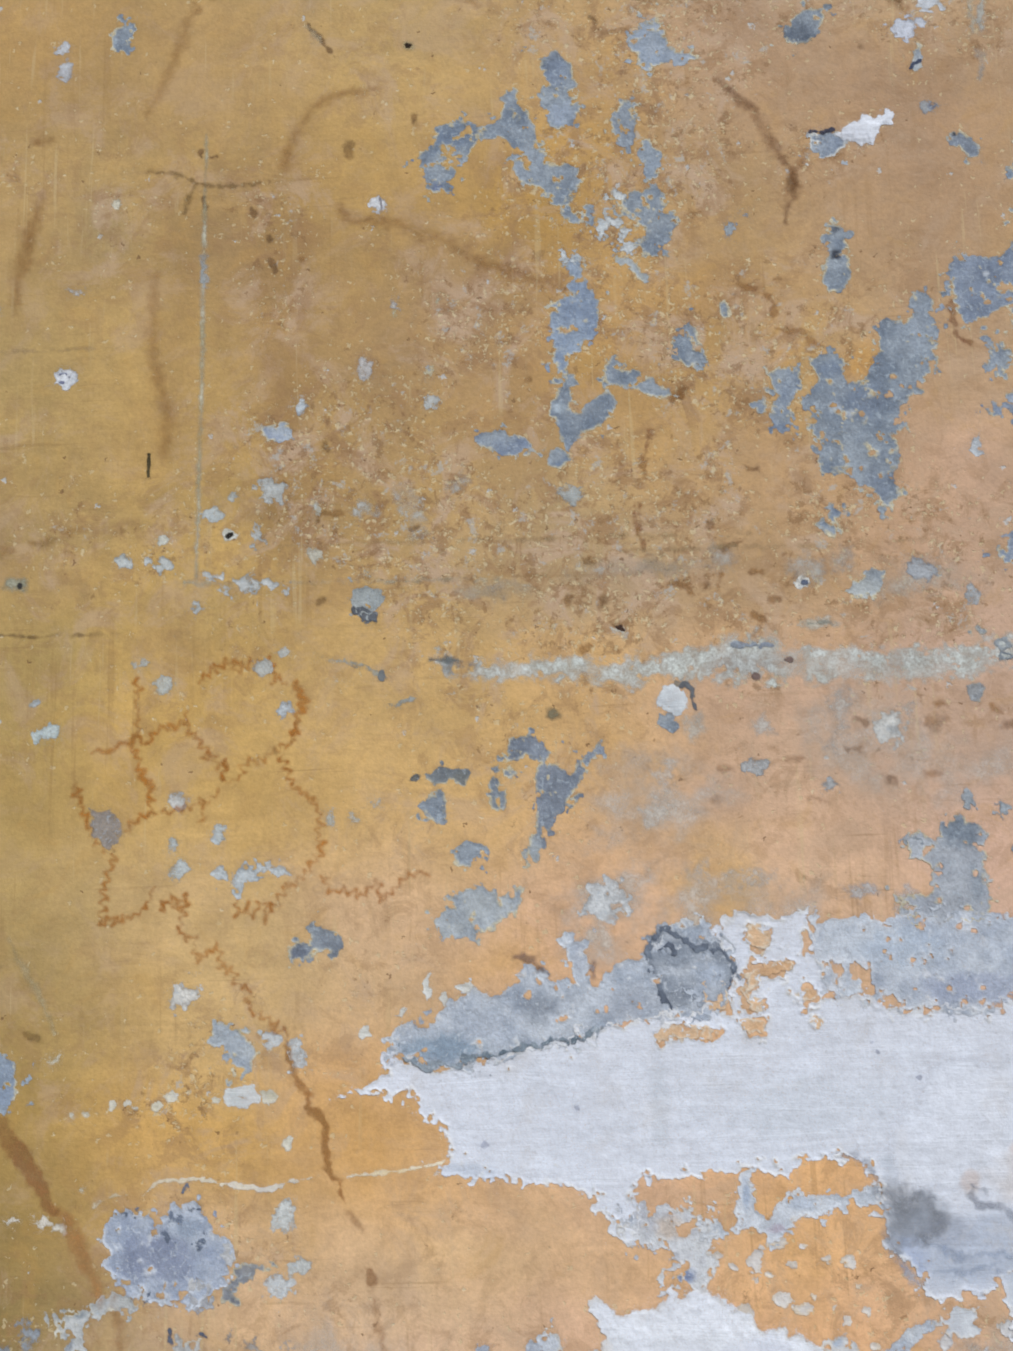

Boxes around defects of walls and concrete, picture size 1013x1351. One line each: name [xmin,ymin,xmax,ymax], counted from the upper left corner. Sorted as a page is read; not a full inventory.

peeling [798,106,894,165]
peeling [946,129,985,166]
peeling [403,48,709,512]
peeling [749,203,1013,521]
peeling [812,501,850,541]
peeling [977,520,1013,574]
peeling [408,760,471,825]
peeling [424,727,607,954]
peeling [0,1047,63,1117]
spalling [329,787,1013,1351]
crack [92,1174,320,1209]
flaking render [0,1183,313,1351]